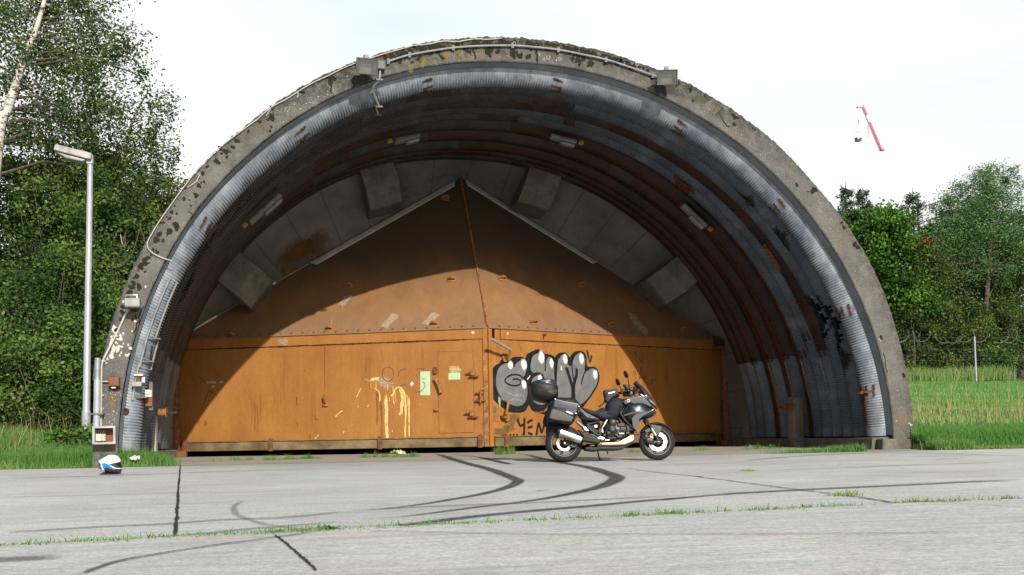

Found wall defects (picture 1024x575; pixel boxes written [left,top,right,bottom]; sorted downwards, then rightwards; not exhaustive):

peeling [105,320,137,364]
corrosion [859,384,875,426]